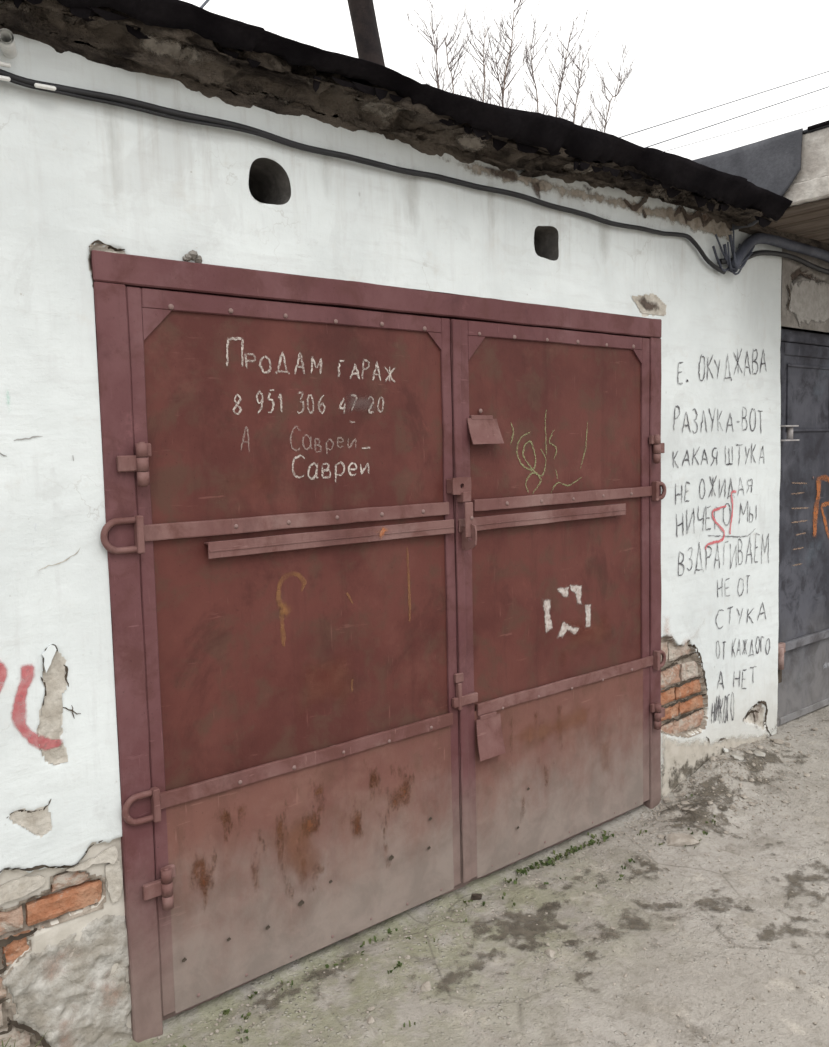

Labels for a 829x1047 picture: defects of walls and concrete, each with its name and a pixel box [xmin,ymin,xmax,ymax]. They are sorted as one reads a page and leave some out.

spalling [141,35,198,63]
flaking render [632,294,666,316]
flaking render [787,268,829,326]
flaking render [38,644,69,765]
flaking render [661,636,708,738]
flaking render [743,701,772,736]
flaking render [7,799,52,835]
flaking render [0,845,132,1047]